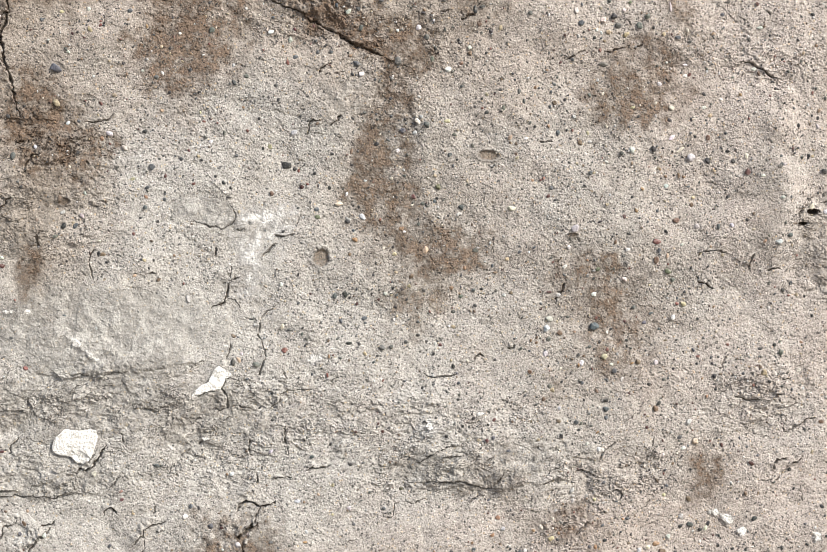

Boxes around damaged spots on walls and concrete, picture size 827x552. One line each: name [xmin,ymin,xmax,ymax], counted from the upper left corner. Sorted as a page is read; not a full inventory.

crack [0,0,49,176]
leakage [4,64,122,186]
leakage [120,0,250,98]
leakage [290,0,489,327]
leakage [581,33,681,130]
crack [211,269,332,411]
crack [235,439,290,552]